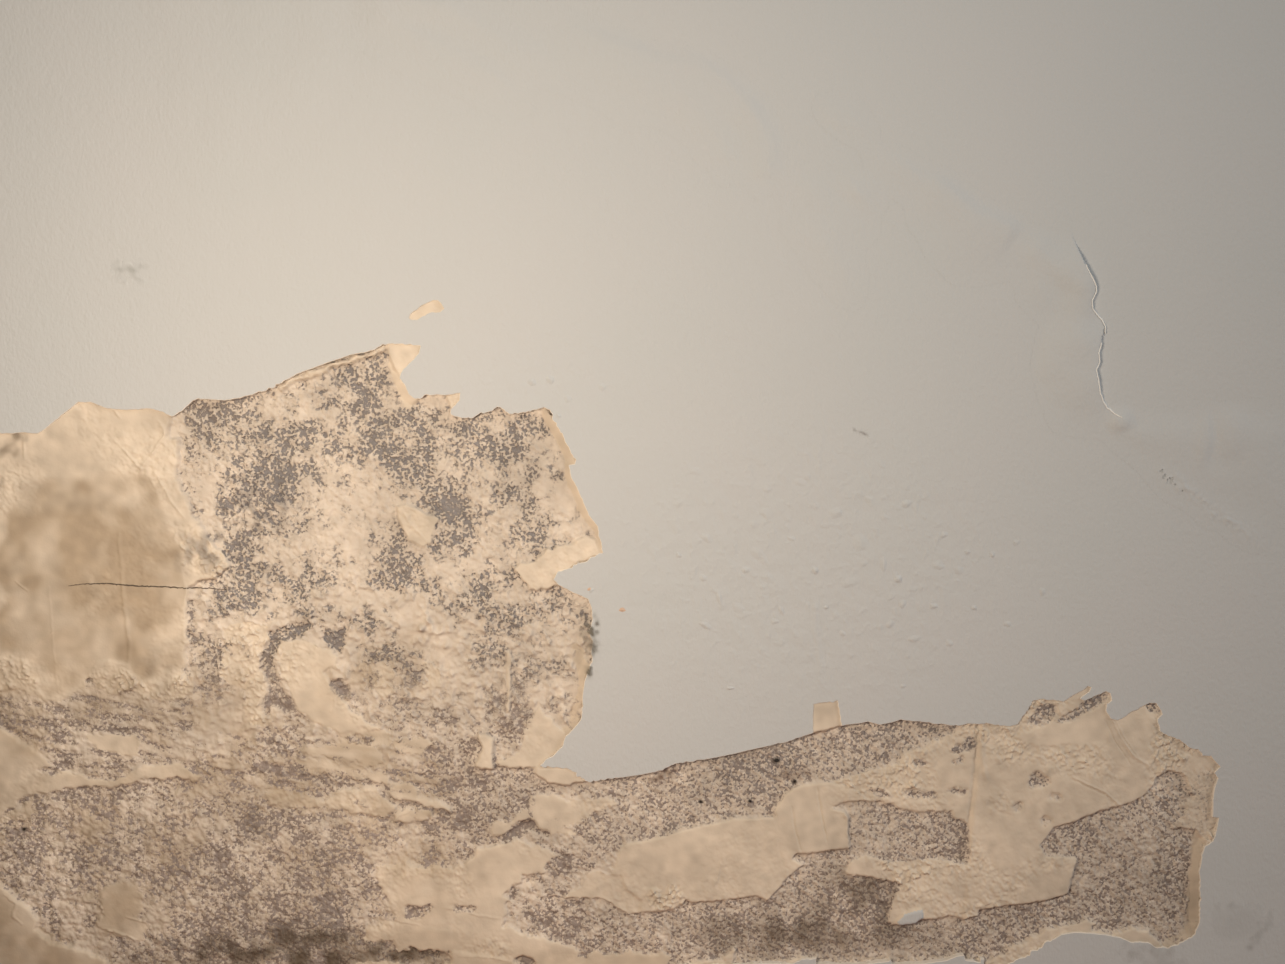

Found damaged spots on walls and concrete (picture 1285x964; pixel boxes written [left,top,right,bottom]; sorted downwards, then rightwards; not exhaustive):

flaking render [0,343,1220,964]